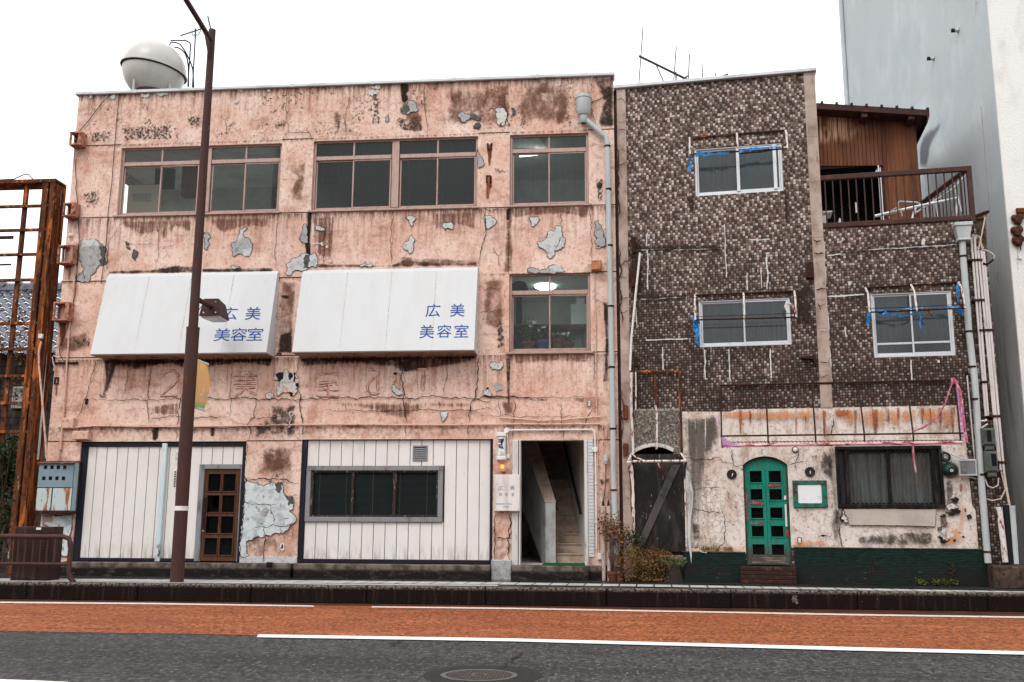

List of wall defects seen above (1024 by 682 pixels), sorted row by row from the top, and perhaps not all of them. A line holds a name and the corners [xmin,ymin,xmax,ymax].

damp [397,84,422,132]
peeling [495,107,516,127]
damp [450,83,568,125]
damp [597,78,613,126]
flaking render [75,239,108,283]
flaking render [527,225,566,274]
flaking render [265,369,299,400]
corrosion [724,407,955,437]
damp [264,449,290,472]
crack [77,355,595,562]
peeling [238,481,297,558]
peeling [930,491,972,544]